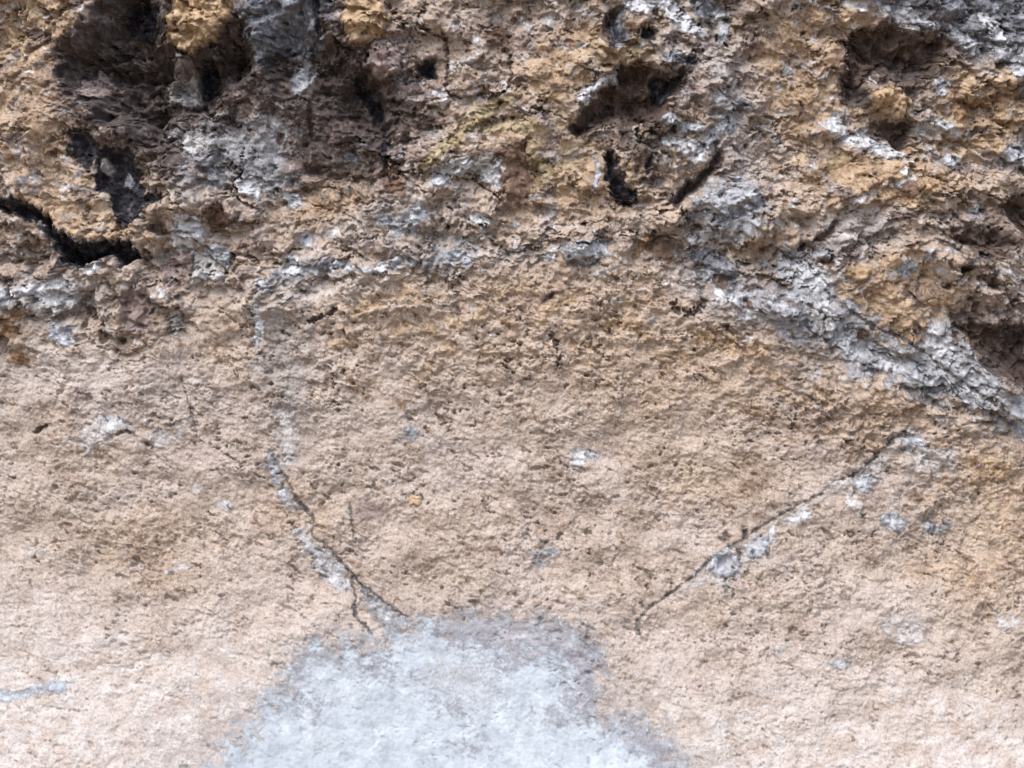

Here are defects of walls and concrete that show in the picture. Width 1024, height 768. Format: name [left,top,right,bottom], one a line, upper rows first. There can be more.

water stain [632,175,1024,445]
water stain [293,527,351,593]
crack [272,455,405,634]
crack [579,510,695,518]
crack [635,423,910,636]
water stain [164,594,698,768]